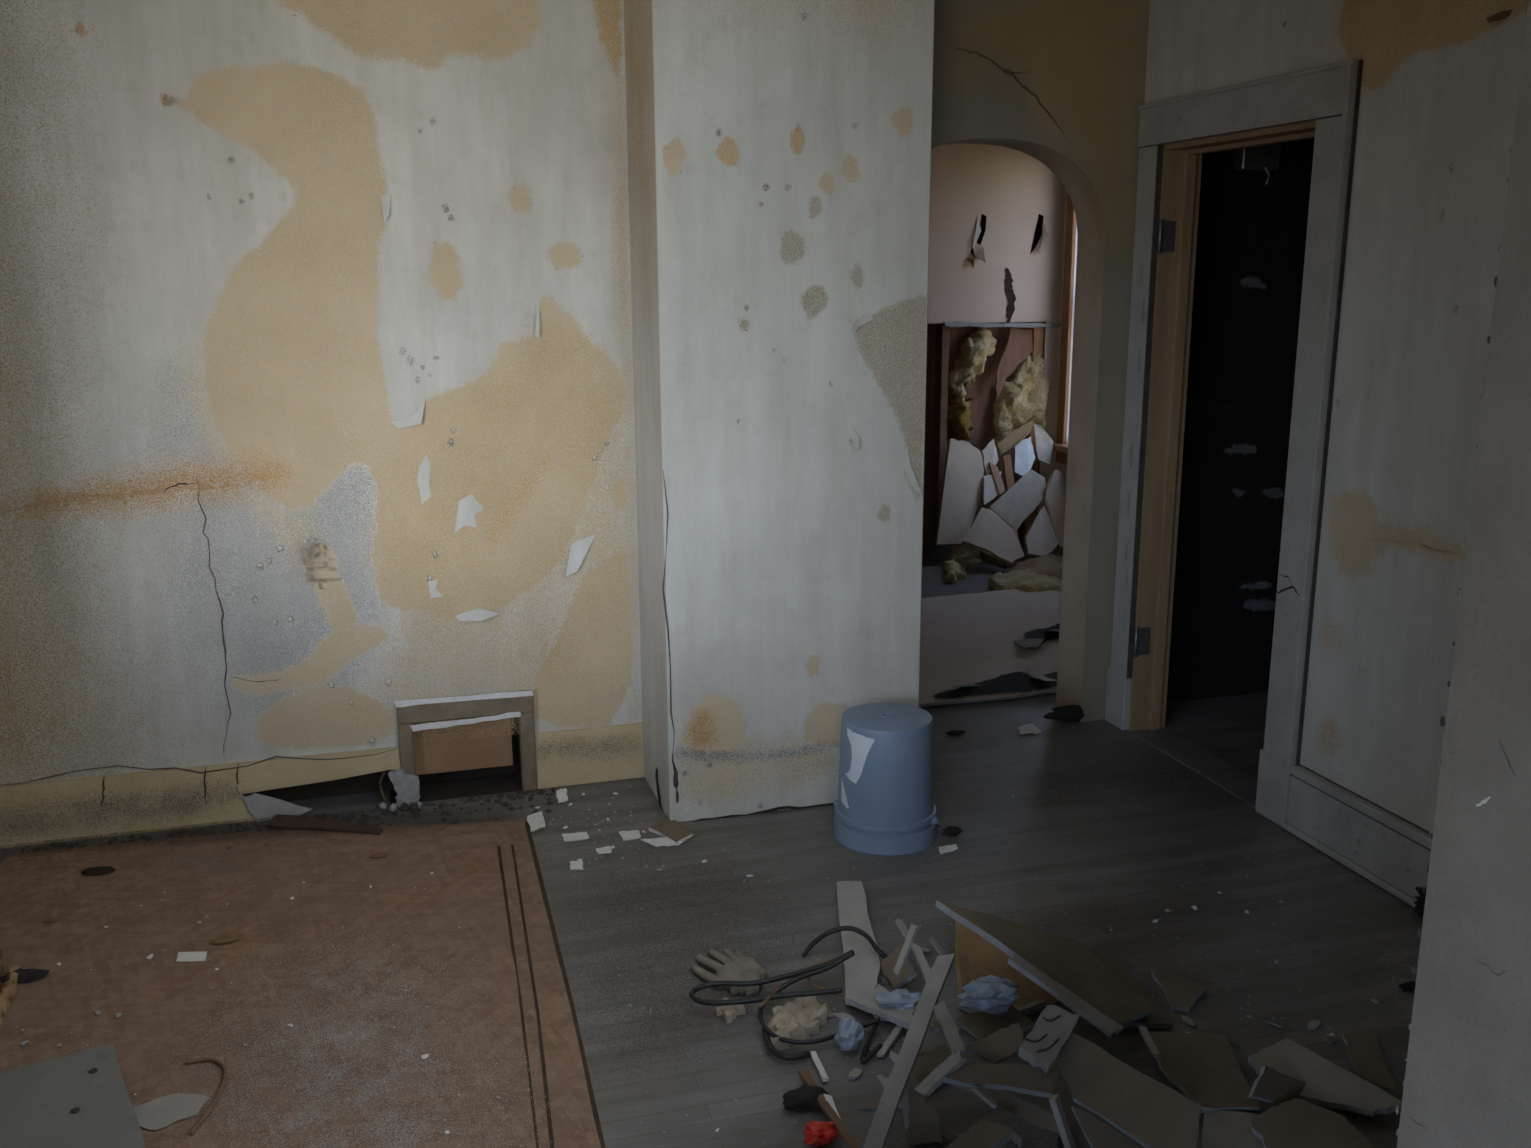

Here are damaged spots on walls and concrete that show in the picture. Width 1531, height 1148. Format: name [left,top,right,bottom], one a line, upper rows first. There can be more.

crack [956,48,1066,138]
spalling [966,218,986,268]
spalling [1039,224,1048,253]
damp [0,0,933,859]
peeling [851,292,1061,503]
crack [0,479,395,807]